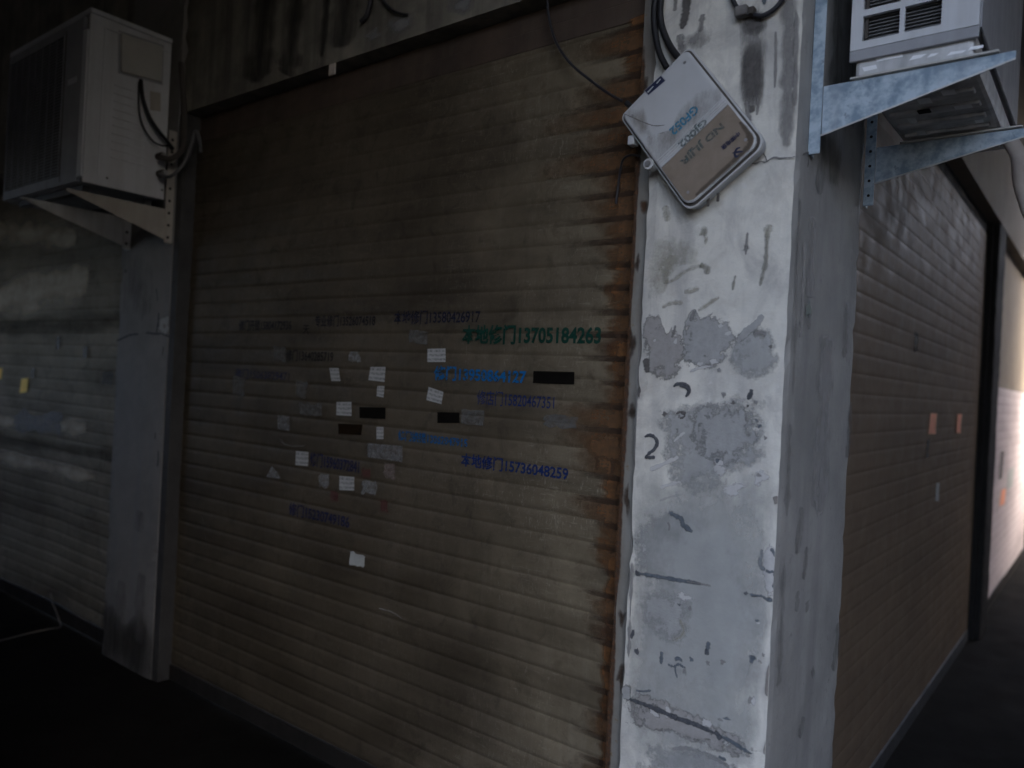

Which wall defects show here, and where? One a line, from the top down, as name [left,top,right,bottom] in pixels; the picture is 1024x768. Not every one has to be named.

damp [742,0,799,145]
rust [568,13,648,768]
crack [635,570,710,587]
peeling [622,309,778,768]
crack [668,663,686,678]
crack [629,690,752,761]